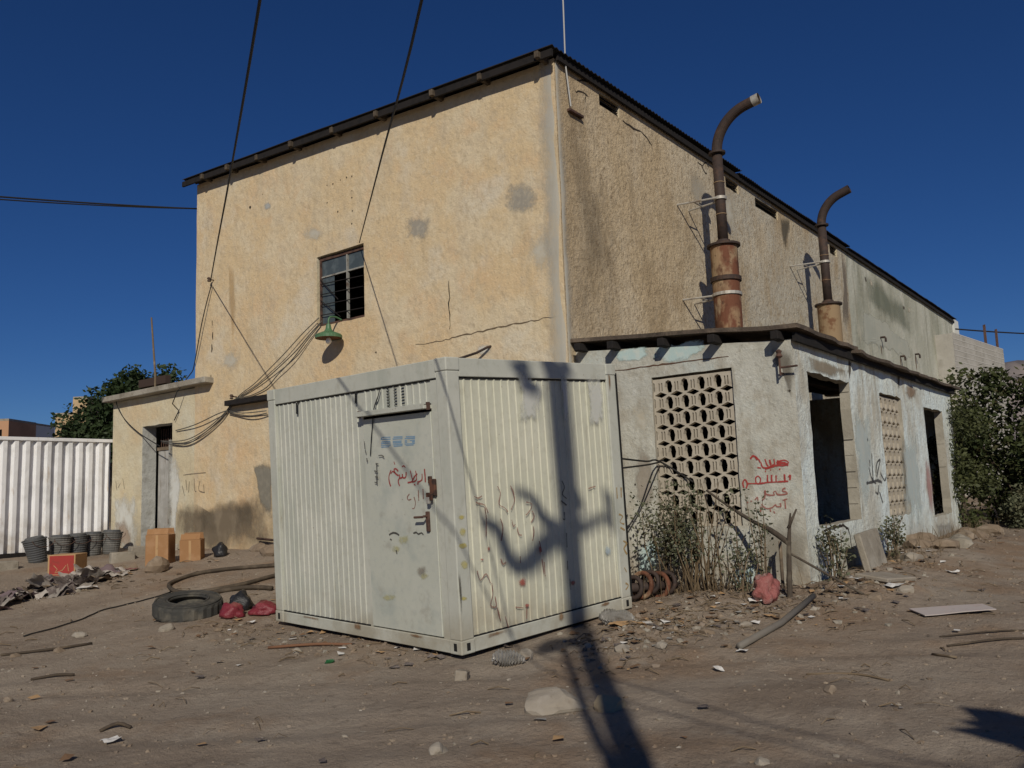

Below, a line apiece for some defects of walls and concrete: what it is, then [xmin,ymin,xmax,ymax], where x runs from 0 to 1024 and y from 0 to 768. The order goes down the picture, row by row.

crack [426,281,553,344]
peeling [616,341,704,362]
leakage [179,504,264,548]